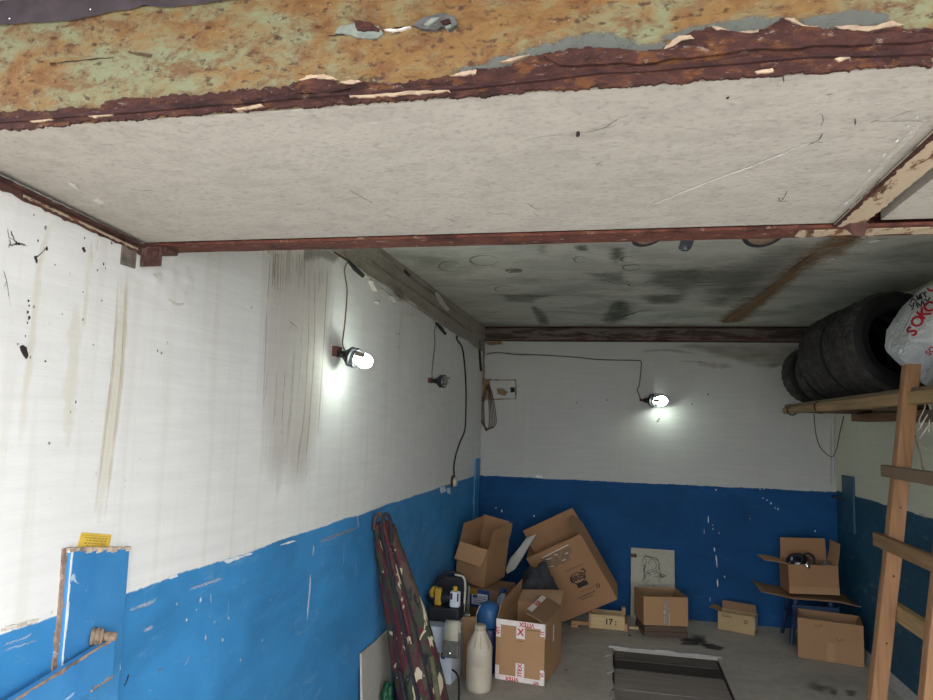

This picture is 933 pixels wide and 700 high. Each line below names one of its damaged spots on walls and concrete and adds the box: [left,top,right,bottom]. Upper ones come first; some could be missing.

peeling [327,12,458,40]
peeling [450,9,904,77]
peeling [298,74,450,99]
rust [0,18,933,132]
peeling [233,104,264,113]